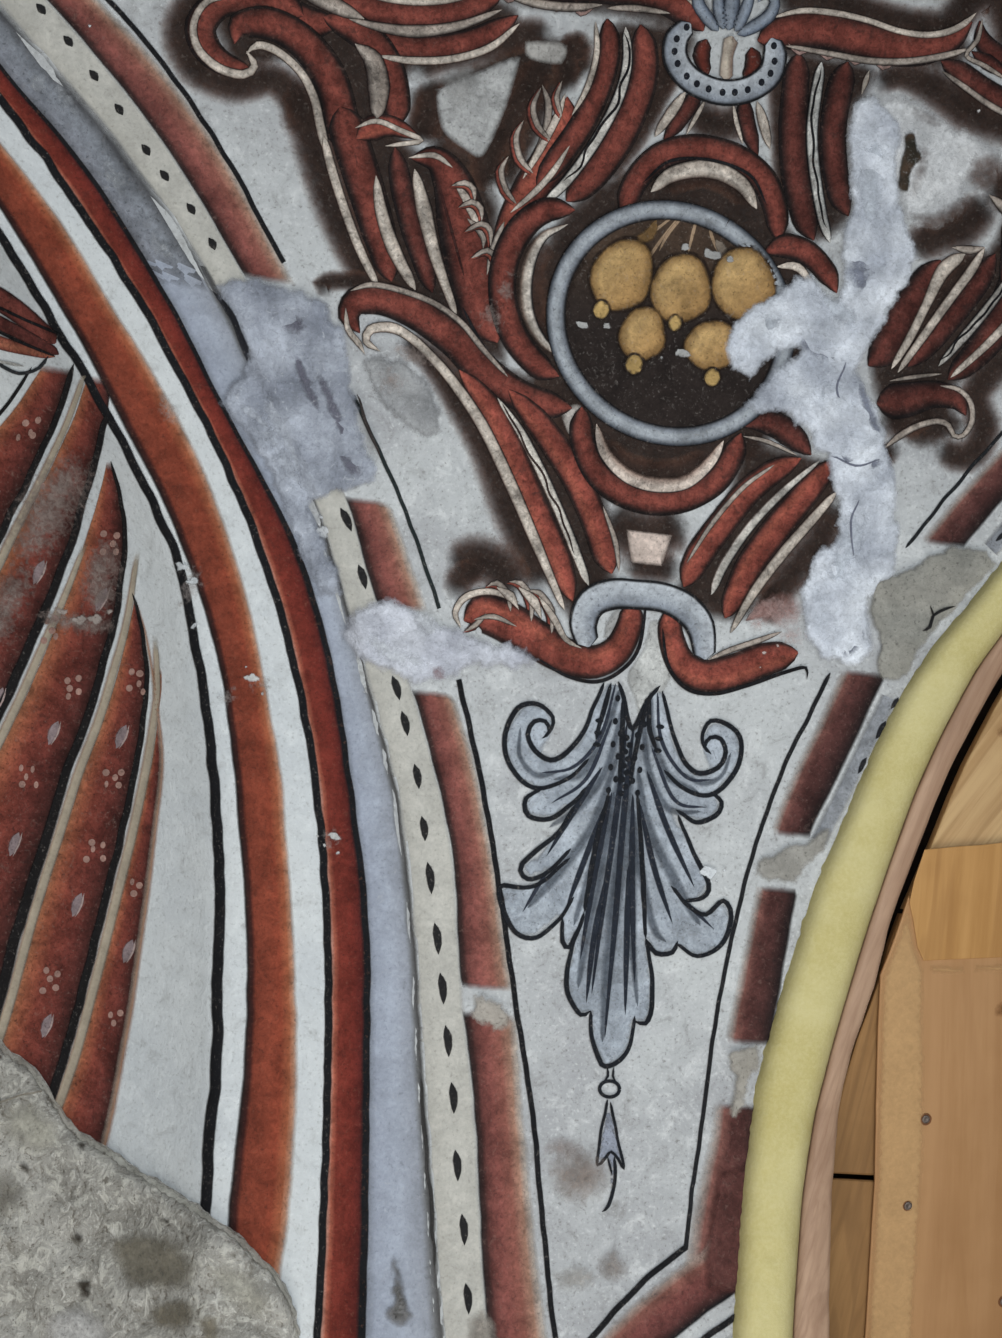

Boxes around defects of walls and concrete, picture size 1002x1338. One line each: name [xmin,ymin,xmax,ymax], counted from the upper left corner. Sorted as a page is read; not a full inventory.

spalling [0,1039,301,1338]